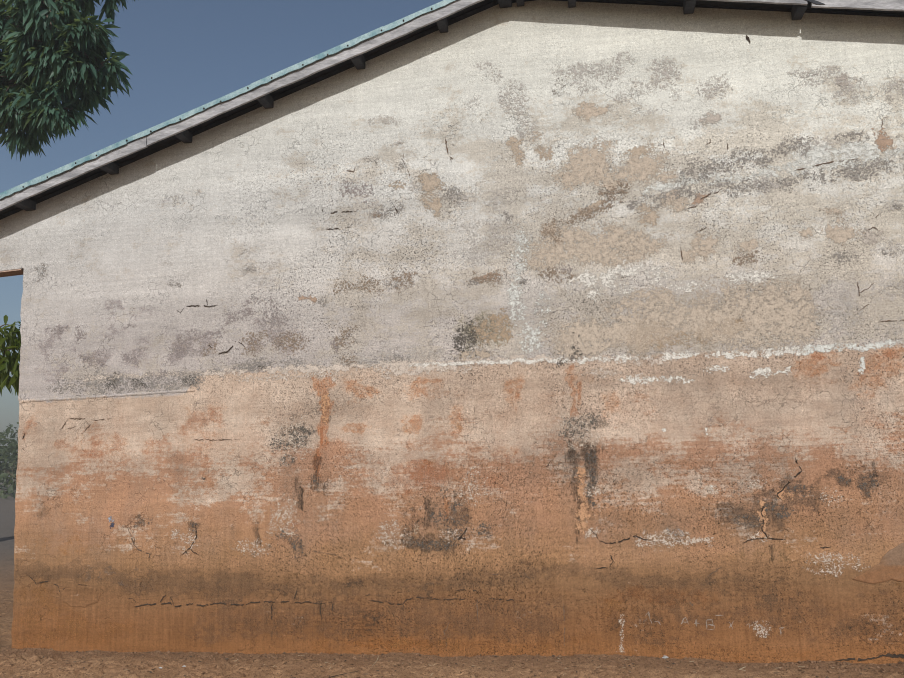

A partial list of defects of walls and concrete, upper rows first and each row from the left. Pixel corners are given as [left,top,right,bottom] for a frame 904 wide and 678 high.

peeling [329,51,904,385]
water stain [450,306,516,366]
water stain [373,464,492,551]
crack [743,458,802,543]
crack [590,529,648,574]
water stain [807,551,870,577]
crack [129,588,333,619]